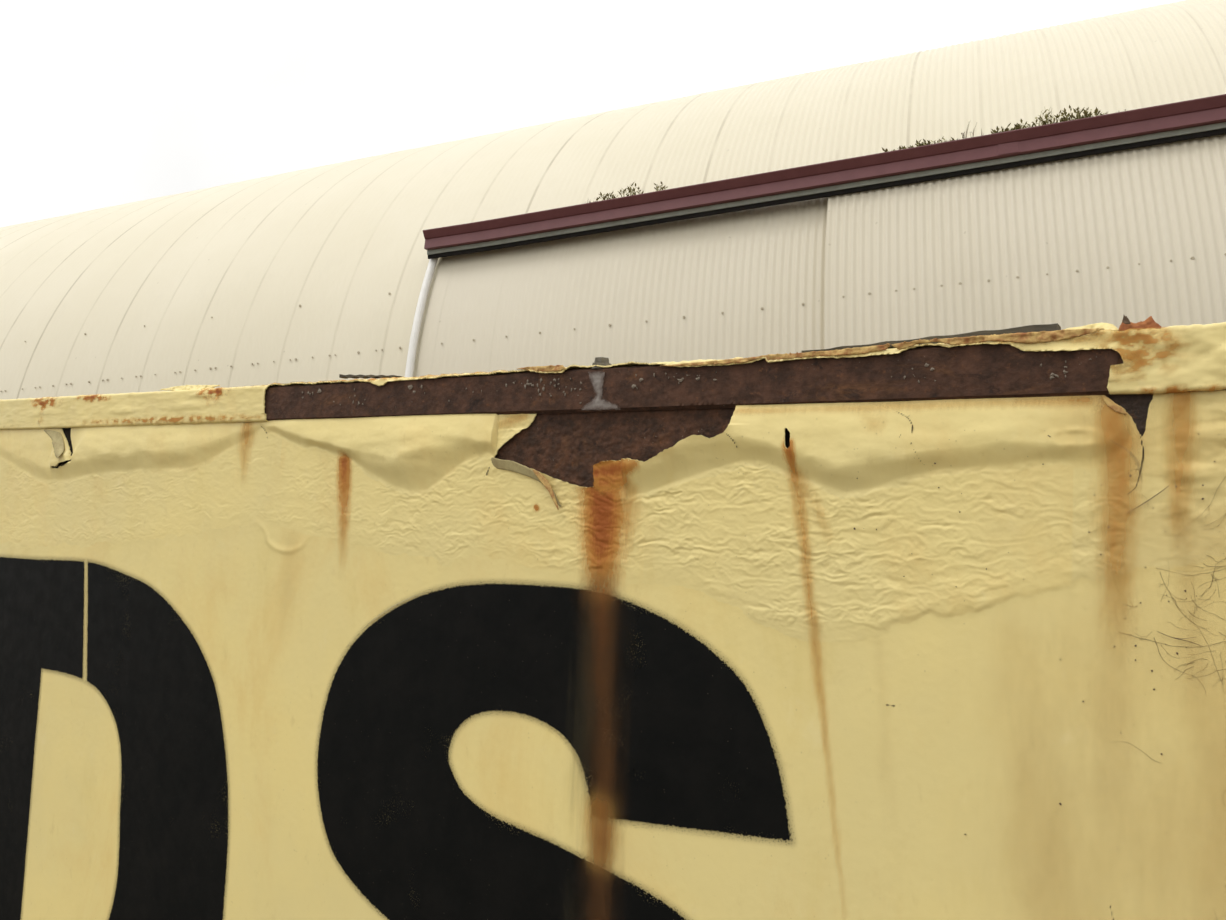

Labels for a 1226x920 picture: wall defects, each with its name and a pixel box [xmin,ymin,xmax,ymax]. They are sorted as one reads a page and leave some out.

corrosion [1097,328,1179,371]
peeling [265,315,1161,510]
corrosion [338,454,350,516]
corrosion [581,459,637,594]
corrosion [783,440,807,559]
corrosion [1069,395,1132,574]
corrosion [590,798,611,866]